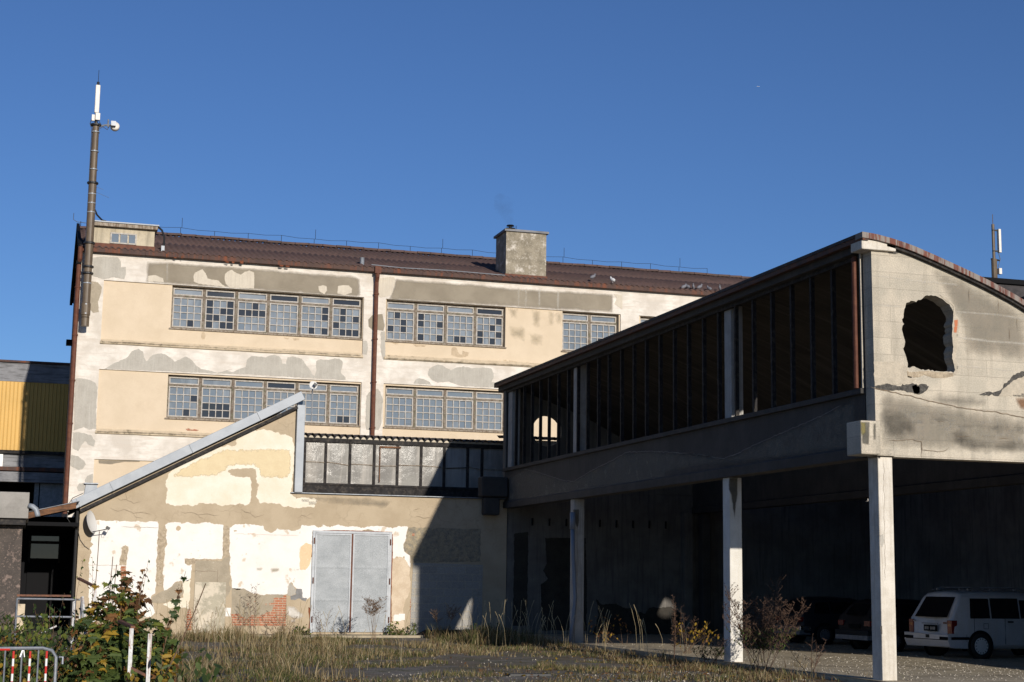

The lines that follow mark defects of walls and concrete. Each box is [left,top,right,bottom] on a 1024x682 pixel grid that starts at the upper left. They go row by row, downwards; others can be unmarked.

flaking render [90,256,126,313]
flaking render [194,269,254,289]
flaking render [318,285,352,295]
flaking render [105,349,346,380]
spalling [874,295,959,394]
flaking render [70,378,98,491]
peeling [165,429,316,508]
damp [862,400,1021,447]
crack [872,387,1024,542]
peeling [88,520,481,632]